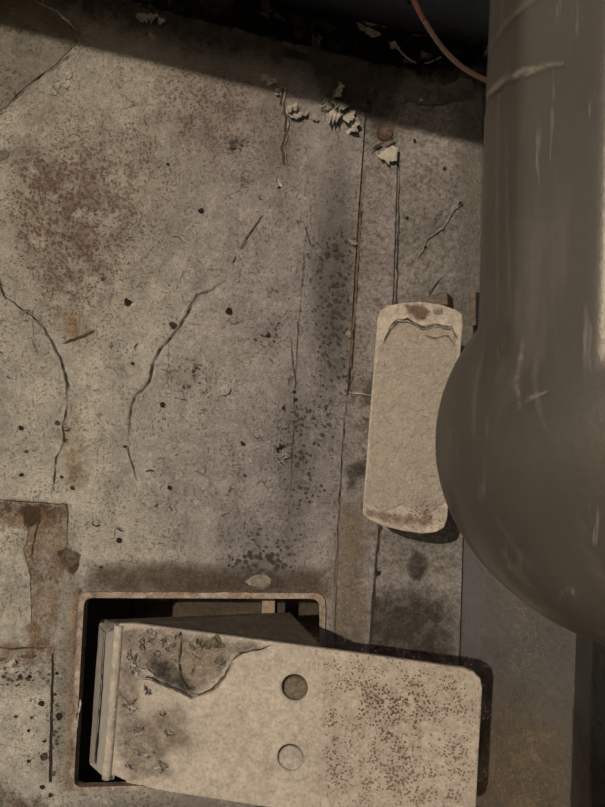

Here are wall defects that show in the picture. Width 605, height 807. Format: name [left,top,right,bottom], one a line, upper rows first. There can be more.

peeling [0,0,79,113]
crack [0,283,68,577]
crack [127,213,264,479]
corrosion [0,502,67,663]